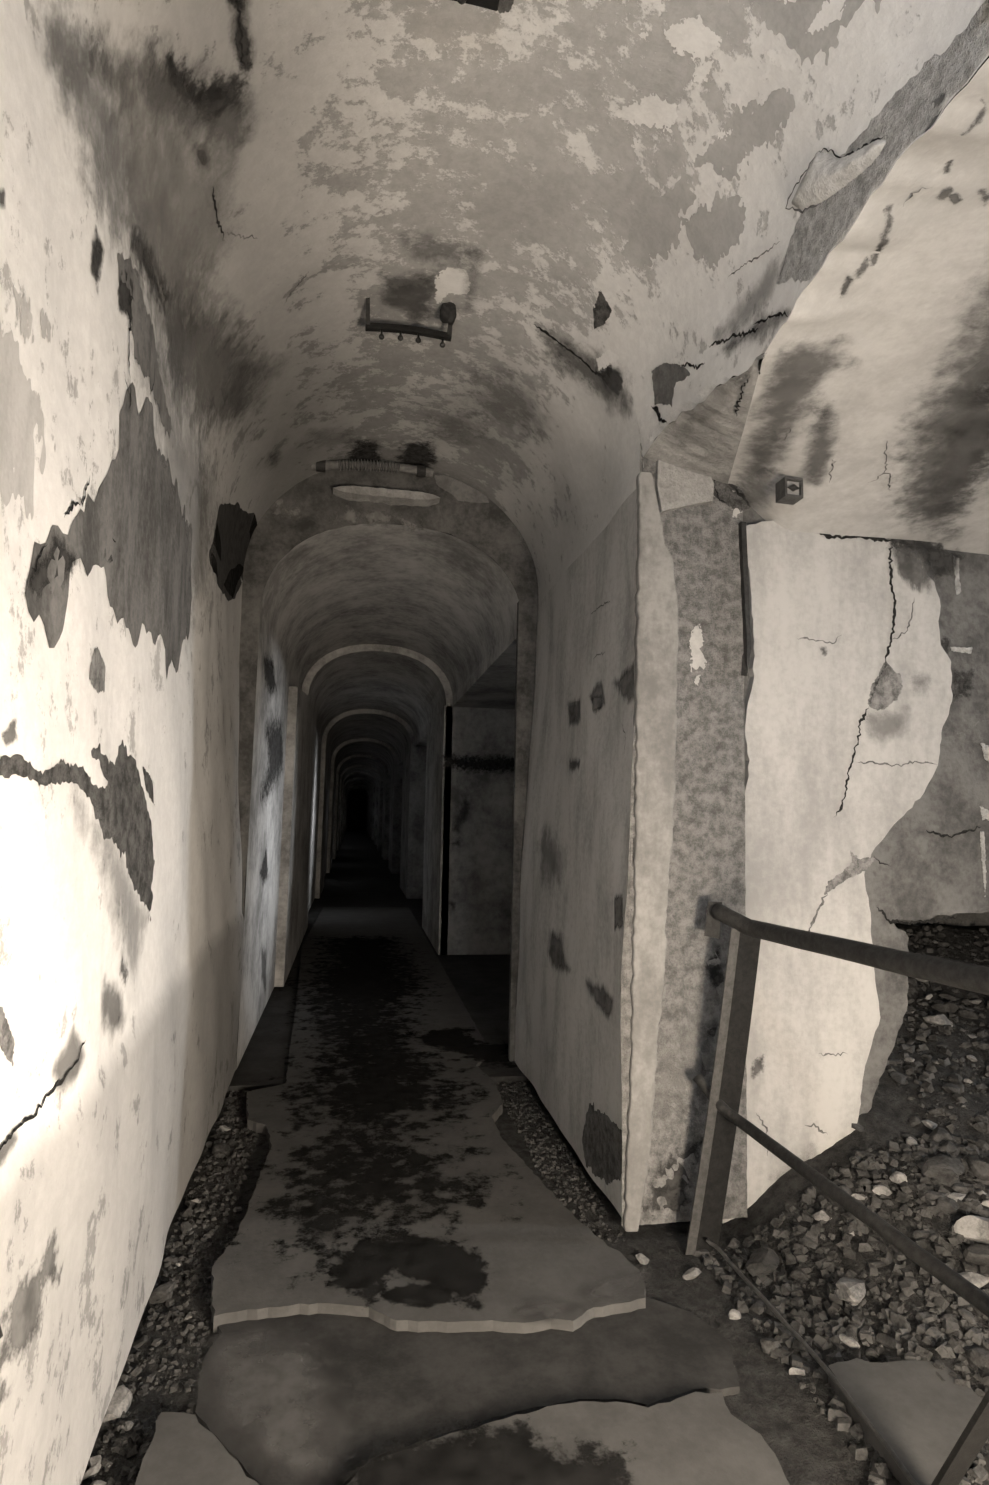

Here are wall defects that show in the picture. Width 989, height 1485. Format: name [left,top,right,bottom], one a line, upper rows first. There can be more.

crack [229,0,252,70]
water stain [59,41,273,431]
peeling [0,287,56,520]
spalling [25,230,257,678]
spalling [89,647,105,694]
crack [797,637,838,655]
crack [819,533,915,662]
crack [836,708,934,816]
spalling [0,721,155,1030]
flaking render [582,455,707,1232]
spalling [0,1007,15,1066]
crack [0,1032,86,1164]